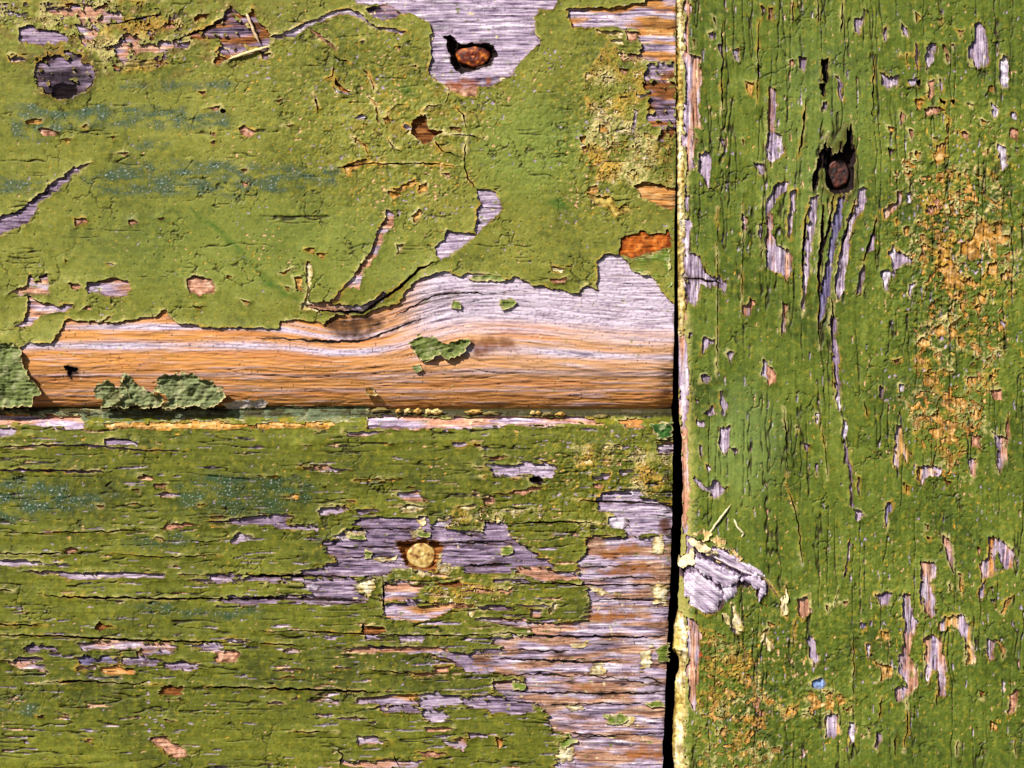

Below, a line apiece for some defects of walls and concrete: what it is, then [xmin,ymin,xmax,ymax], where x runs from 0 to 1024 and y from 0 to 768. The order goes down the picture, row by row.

peeling [270,0,676,217]
peeling [0,163,90,235]
crack [684,194,764,374]
peeling [742,298,755,316]
crack [801,195,877,347]
peeling [0,179,743,768]
crack [783,408,803,563]